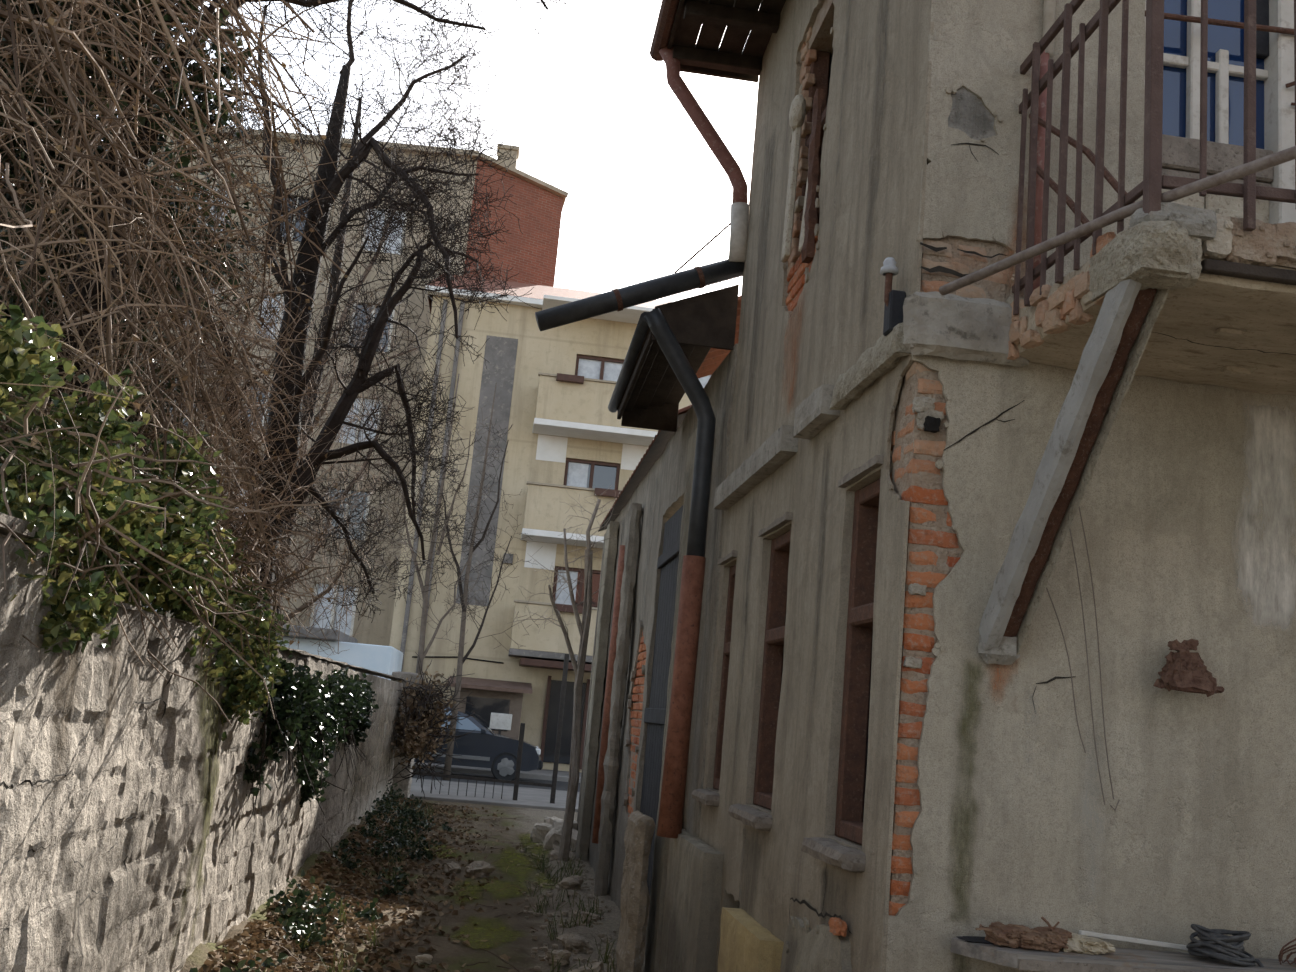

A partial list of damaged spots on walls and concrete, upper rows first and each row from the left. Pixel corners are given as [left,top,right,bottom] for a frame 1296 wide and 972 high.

flaking render [781,27,827,311]
flaking render [916,230,1016,298]
spalling [1007,202,1296,360]
flaking render [886,361,960,916]
damp [1239,406,1296,627]
crack [0,650,178,971]